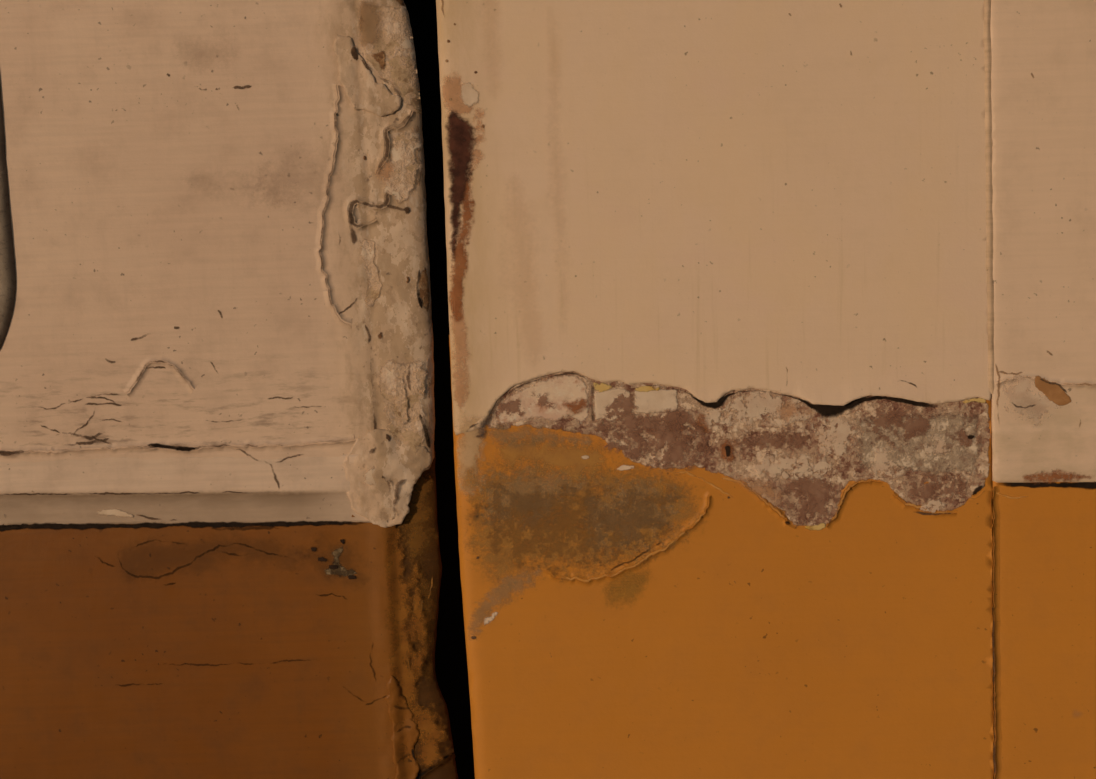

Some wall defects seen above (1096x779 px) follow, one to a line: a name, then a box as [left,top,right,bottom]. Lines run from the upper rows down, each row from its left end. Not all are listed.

peeling [333,0,422,117]
corrosion [443,71,484,406]
peeling [406,268,430,311]
crack [6,490,67,498]
crack [93,489,198,497]
crack [0,354,376,488]
peeling [379,360,431,453]
peeling [457,371,991,530]
peeling [1002,374,1071,425]
crack [0,521,361,585]